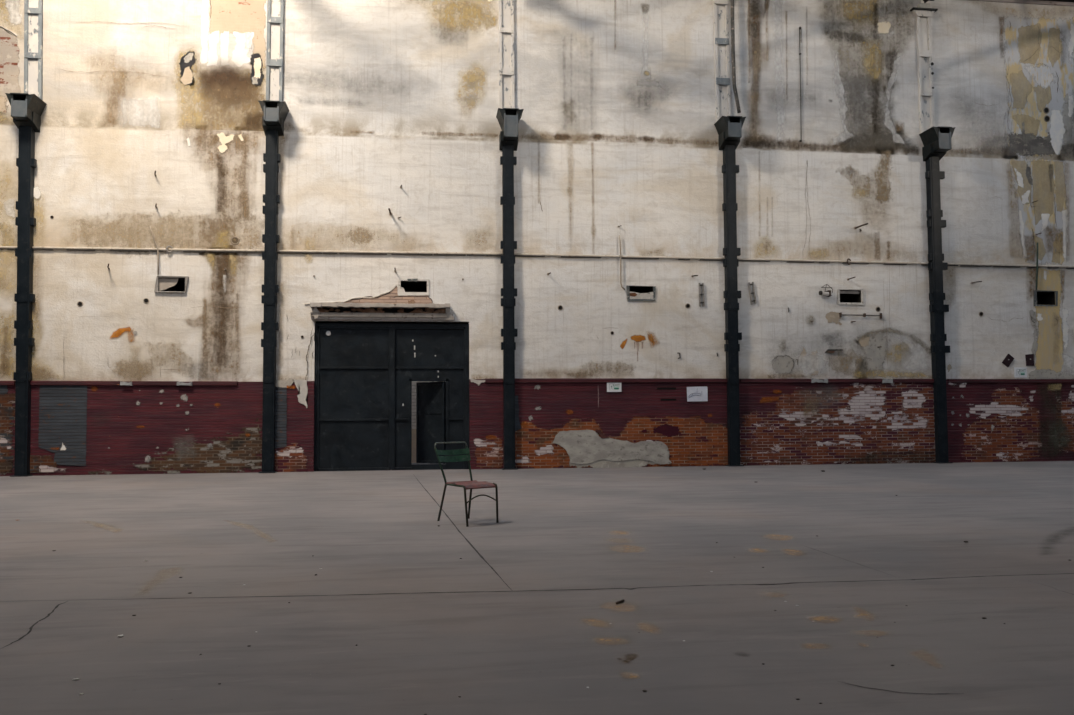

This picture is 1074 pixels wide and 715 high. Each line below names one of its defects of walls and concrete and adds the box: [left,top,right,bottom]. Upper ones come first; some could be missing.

flaking render [0,25,21,113]
water stain [824,0,915,203]
peeling [949,14,1074,462]
rust [110,327,137,342]
rust [620,333,657,355]
peeling [0,394,15,475]
peeling [474,378,936,469]